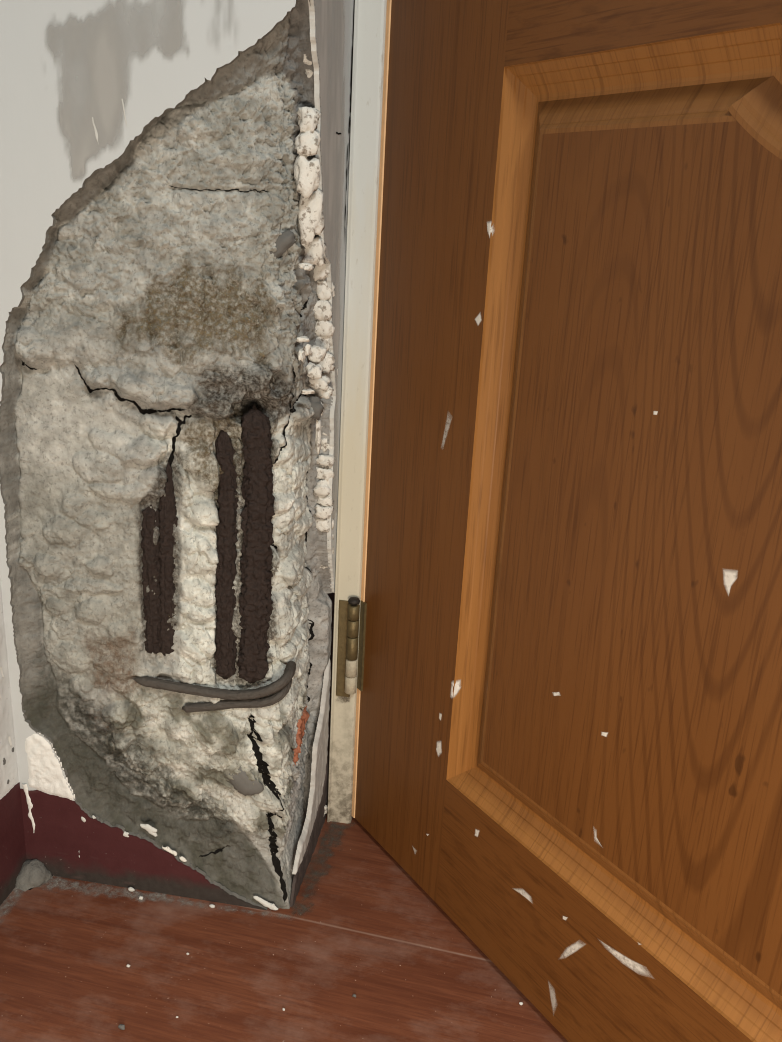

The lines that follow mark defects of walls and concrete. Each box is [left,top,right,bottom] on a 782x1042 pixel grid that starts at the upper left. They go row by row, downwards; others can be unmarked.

spalling [0,0,344,910]
rust [117,266,295,684]
crack [247,713,288,902]